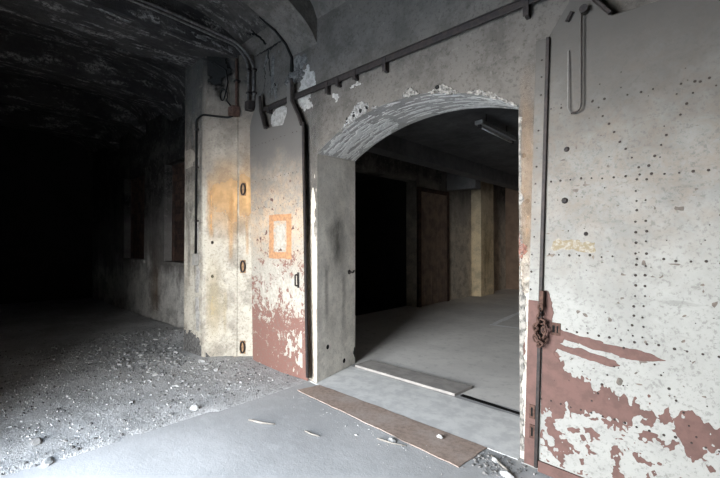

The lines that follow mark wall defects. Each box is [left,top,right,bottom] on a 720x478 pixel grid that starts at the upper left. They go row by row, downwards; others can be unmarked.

rust [210,174,251,222]
peeling [254,188,317,382]
peeling [284,53,316,112]
peeling [318,83,524,205]
spalling [519,233,528,451]
peeling [540,290,720,478]